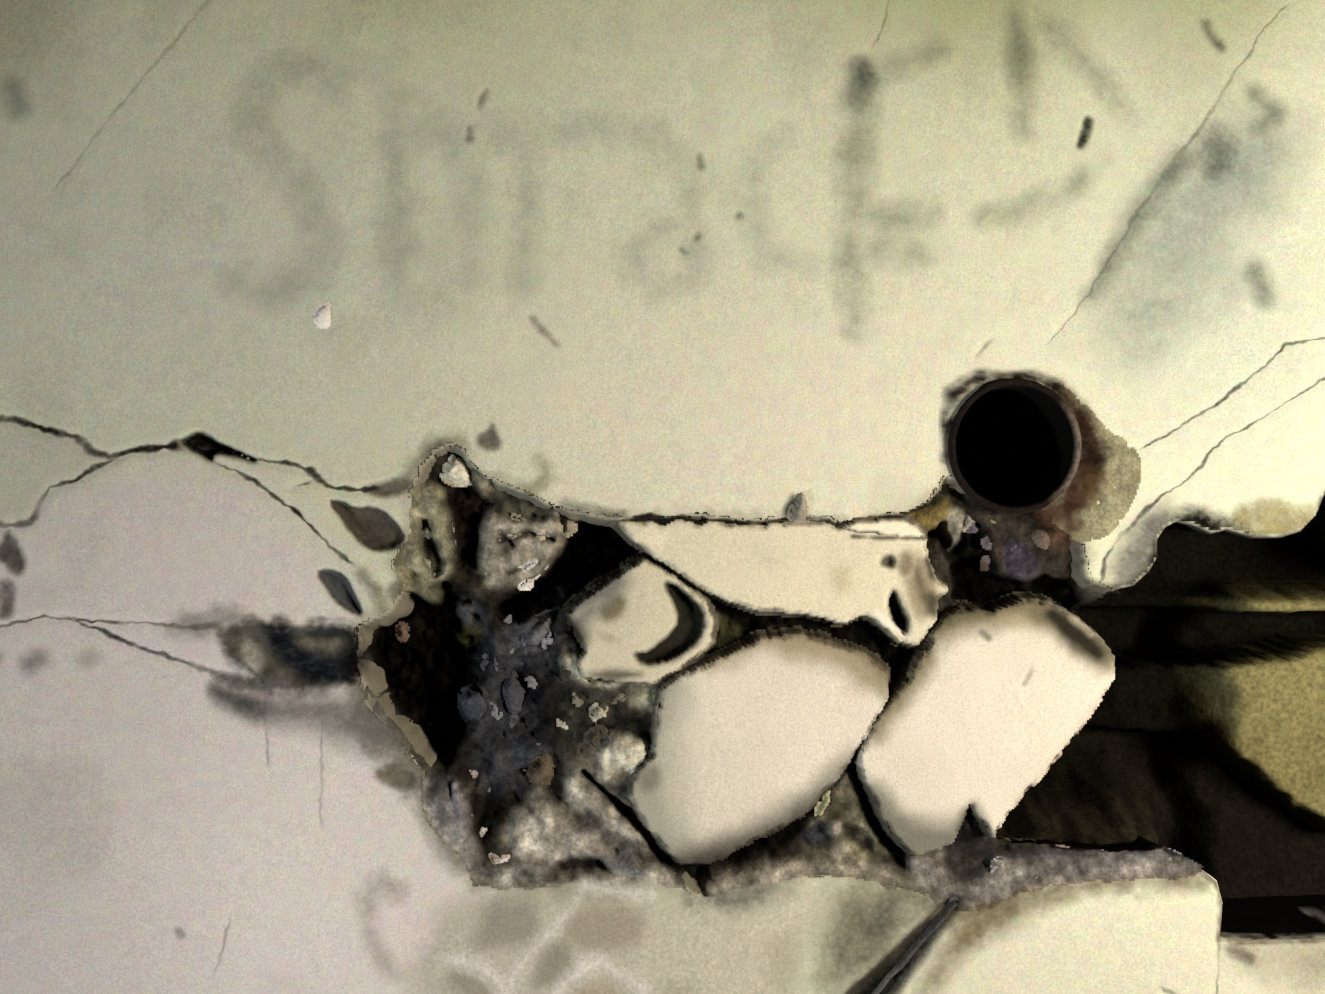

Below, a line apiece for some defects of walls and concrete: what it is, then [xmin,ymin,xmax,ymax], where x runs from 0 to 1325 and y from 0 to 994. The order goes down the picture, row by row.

crack [0,417,179,486]
crack [226,460,376,562]
corrosion [942,371,1105,542]
crack [1146,385,1241,446]
crack [1138,423,1253,518]
flaking render [182,425,1204,994]